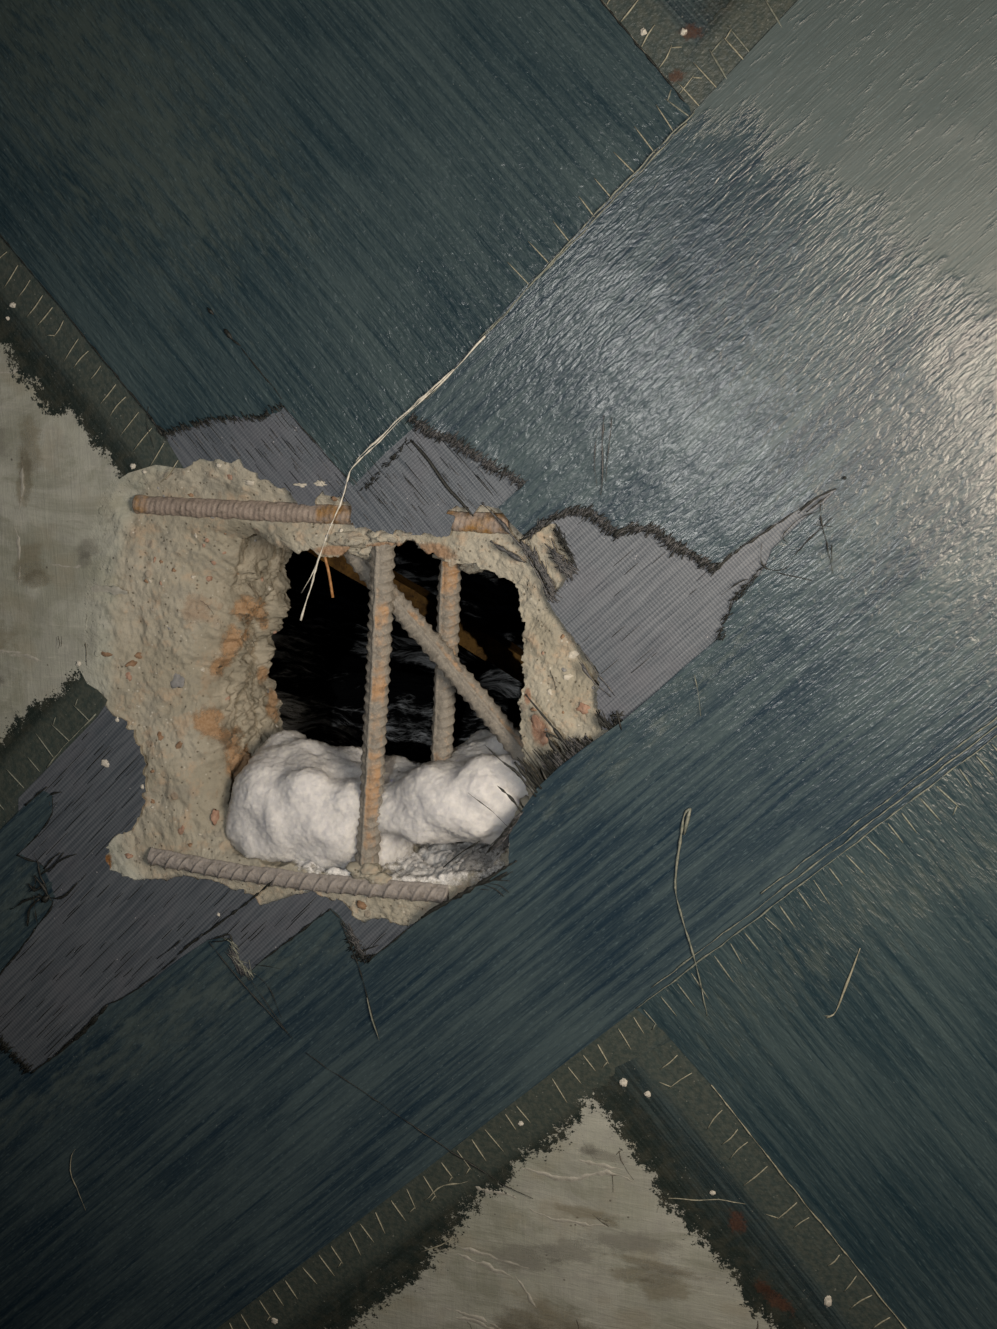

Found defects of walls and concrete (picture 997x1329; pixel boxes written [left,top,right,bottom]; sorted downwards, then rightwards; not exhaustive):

rust [318,546,349,555]
rust [419,544,454,557]
rust [210,596,269,674]
rust [257,667,279,722]
spalling [0,329,846,1075]
rust [194,709,251,776]